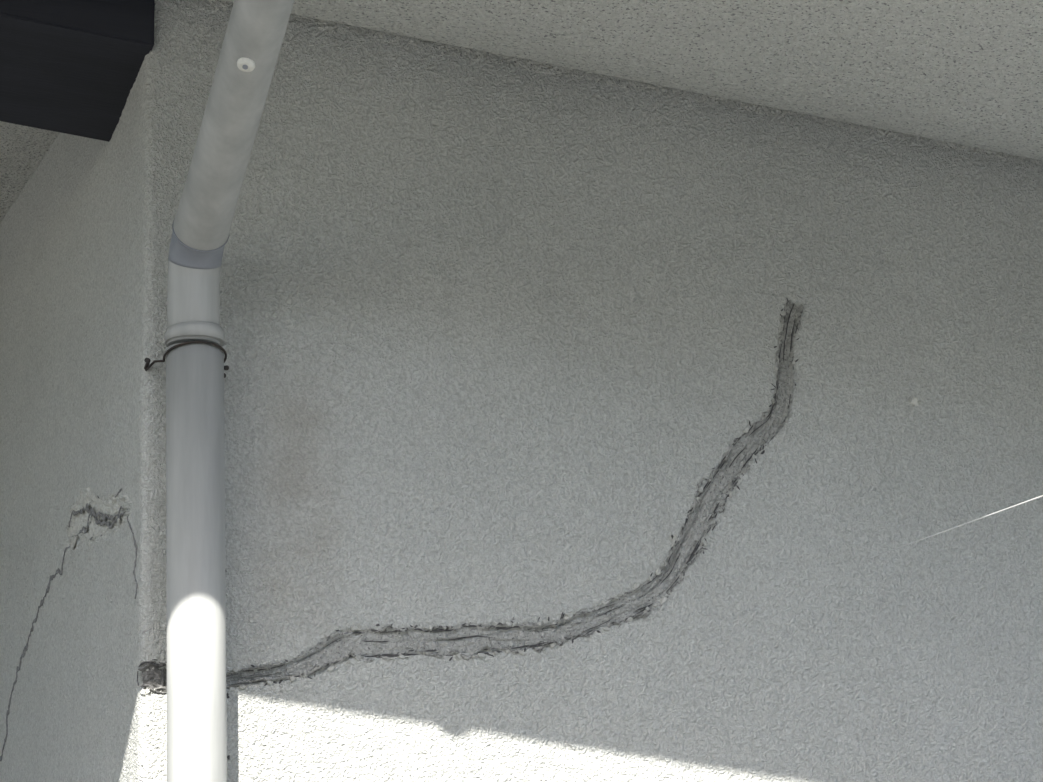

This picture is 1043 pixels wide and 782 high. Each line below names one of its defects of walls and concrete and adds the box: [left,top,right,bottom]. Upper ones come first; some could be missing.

crack [0,487,138,761]
crack [226,298,804,691]